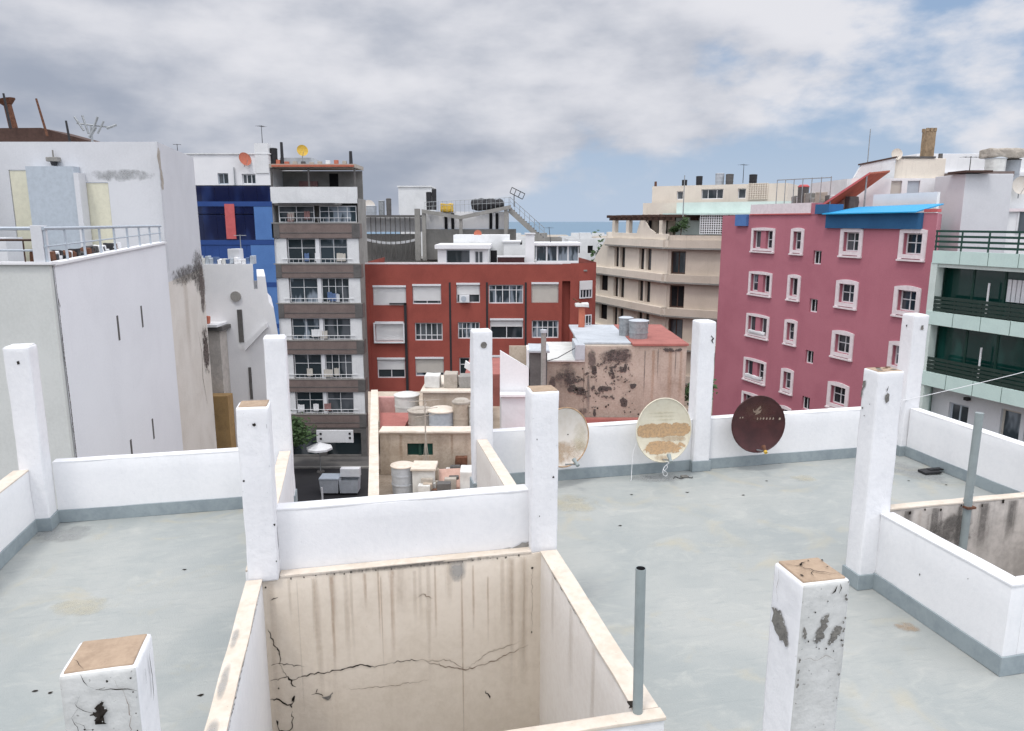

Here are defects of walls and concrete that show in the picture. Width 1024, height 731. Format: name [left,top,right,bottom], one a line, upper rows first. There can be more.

leakage [173,252,205,312]
leakage [931,504,988,546]
leakage [361,561,462,576]
crack [251,572,581,731]
peeling [772,607,788,647]
peeling [803,612,846,652]
spalling [84,701,108,731]